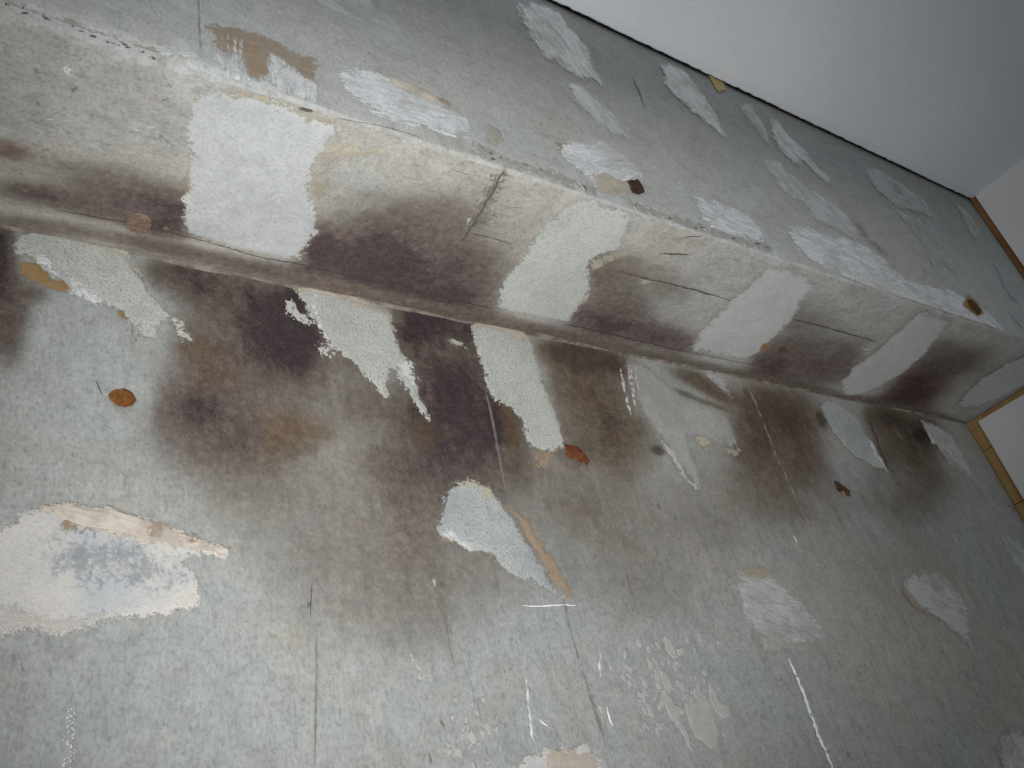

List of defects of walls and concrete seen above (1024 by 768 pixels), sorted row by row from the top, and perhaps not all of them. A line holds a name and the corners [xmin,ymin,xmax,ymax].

damp [0,143,23,159]
rust [627,179,644,195]
crack [57,169,521,309]
peeling [19,253,103,305]
rust [108,388,136,407]
damp [0,178,972,615]
rust [564,443,590,465]